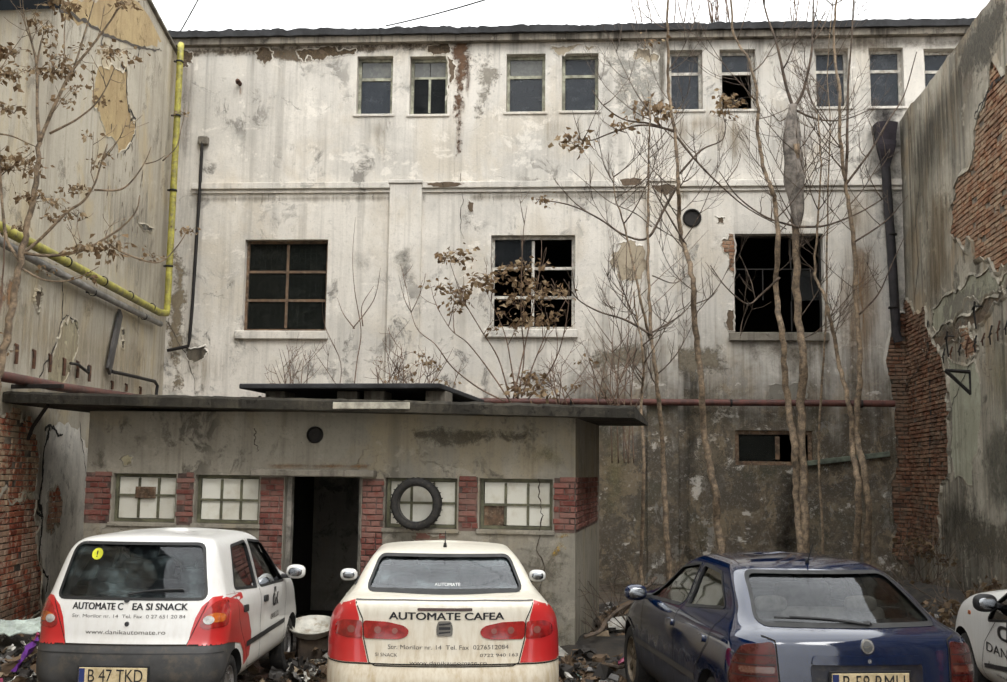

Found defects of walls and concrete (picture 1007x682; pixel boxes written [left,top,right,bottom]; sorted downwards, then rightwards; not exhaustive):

flaking render [254,46,274,66]
flaking render [295,45,358,63]
flaking render [714,215,737,278]
flaking render [883,53,1007,567]
water stain [678,347,728,396]
water stain [414,428,527,446]
flaking render [0,404,88,620]
water stain [942,502,1007,564]